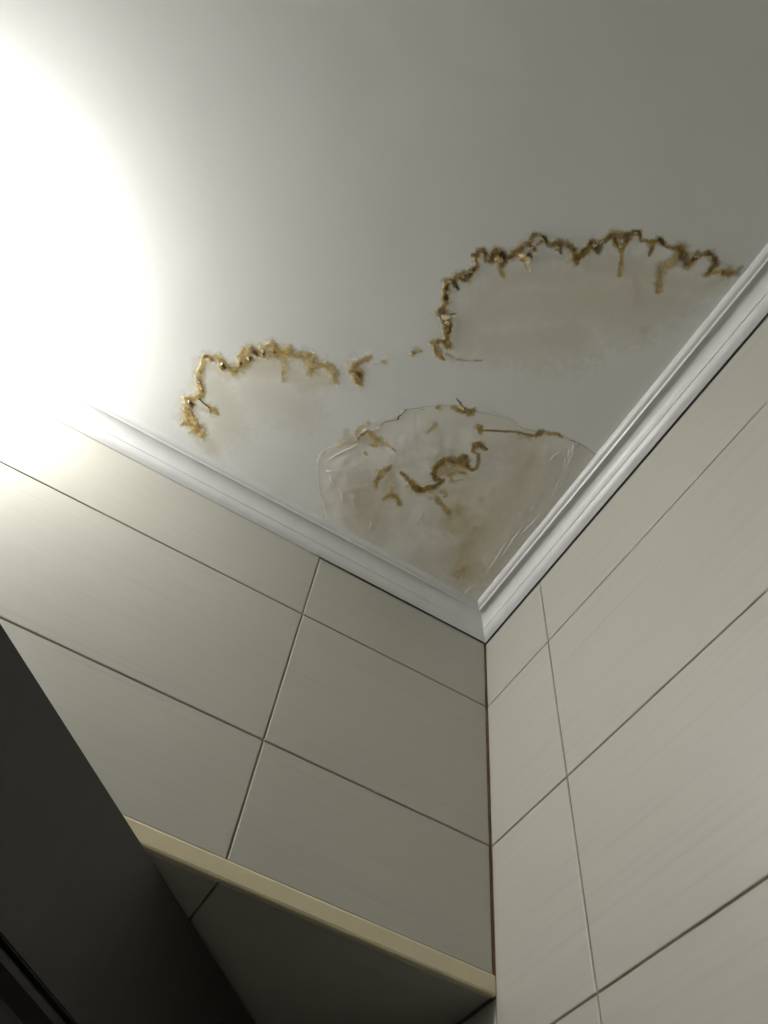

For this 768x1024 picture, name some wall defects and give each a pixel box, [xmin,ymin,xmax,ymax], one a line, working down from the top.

damp [410,230,740,361]
damp [180,340,386,437]
damp [374,398,488,514]